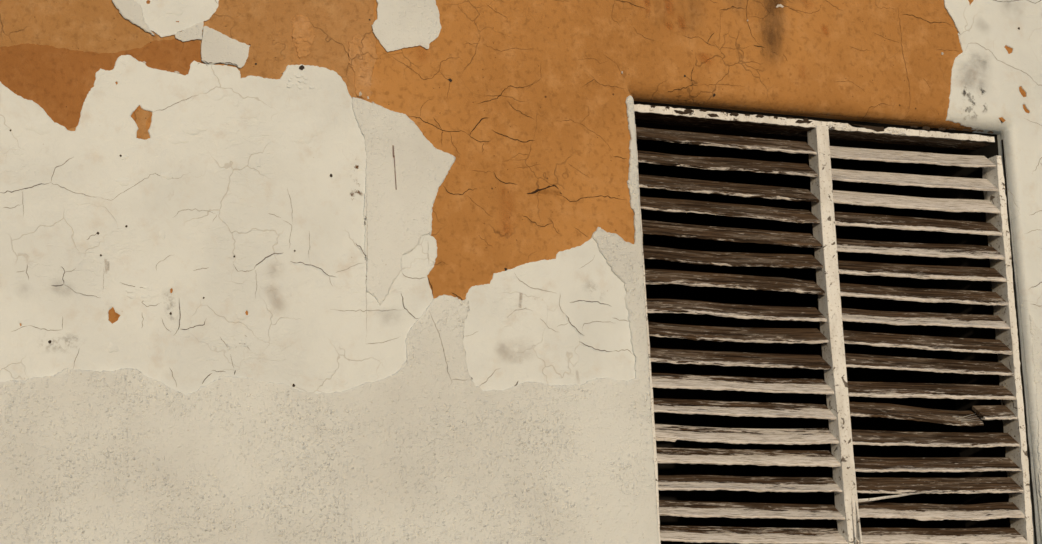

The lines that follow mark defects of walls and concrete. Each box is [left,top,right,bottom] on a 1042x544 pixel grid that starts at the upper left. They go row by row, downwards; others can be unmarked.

crack [683,0,840,60]
crack [0,157,190,215]
crack [388,43,541,246]
peeling [0,0,976,300]
peeling [108,307,120,324]
crack [20,255,250,384]
crack [235,189,518,386]
crack [507,274,633,355]
crack [1001,139,1042,544]